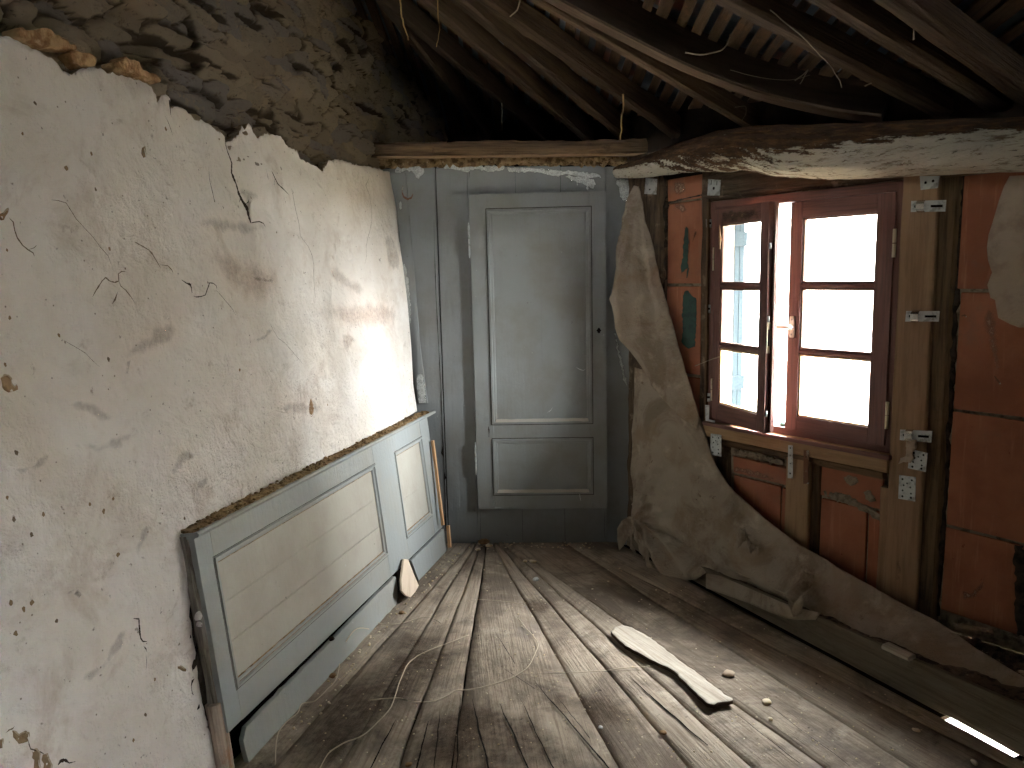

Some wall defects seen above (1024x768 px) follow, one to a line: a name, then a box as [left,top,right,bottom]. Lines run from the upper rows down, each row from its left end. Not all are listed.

crack [209,143,265,226]
peeling [395,166,424,179]
peeling [437,164,601,190]
crack [10,219,37,255]
crack [135,242,233,310]
flaking render [1,362,18,393]
flaking render [0,730,53,768]